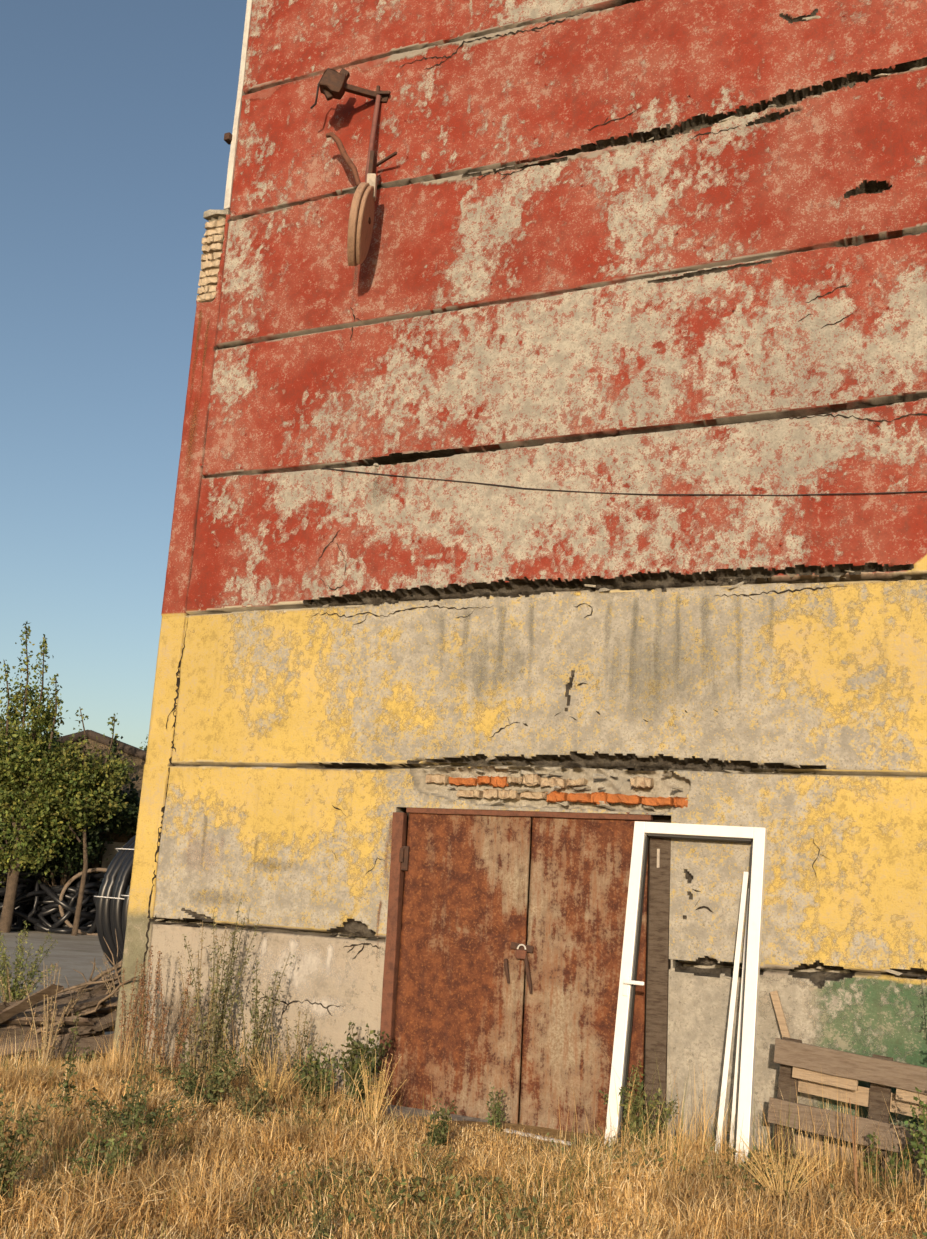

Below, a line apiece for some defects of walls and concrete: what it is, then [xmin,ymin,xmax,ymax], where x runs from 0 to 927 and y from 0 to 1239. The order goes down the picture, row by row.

crack [400,11,594,70]
crack [587,108,640,130]
crack [686,125,740,143]
crack [478,165,546,180]
peeling [154,0,927,1156]
crack [715,586,847,600]
crack [489,683,600,738]
crack [251,996,345,1017]